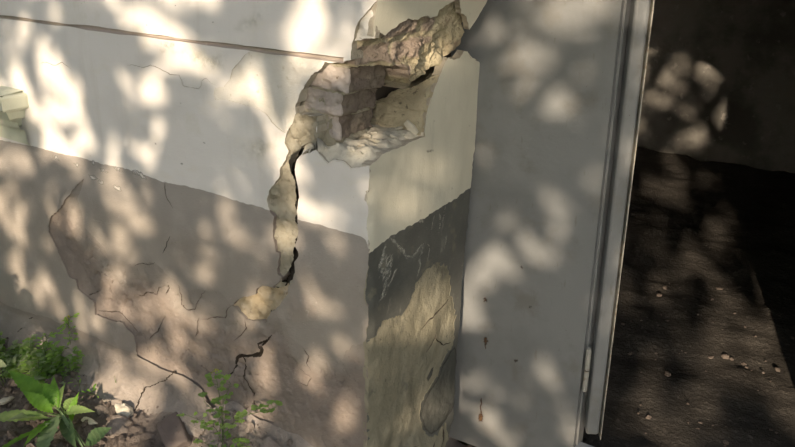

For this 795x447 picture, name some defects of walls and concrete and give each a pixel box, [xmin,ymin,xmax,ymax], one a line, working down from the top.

flaking render [214,1,464,153]
crack [103,311,164,338]
crack [134,371,177,411]
crack [139,285,229,337]
crack [230,323,272,404]
flaking render [50,167,456,447]
crack [423,300,449,352]
water stain [421,348,456,433]